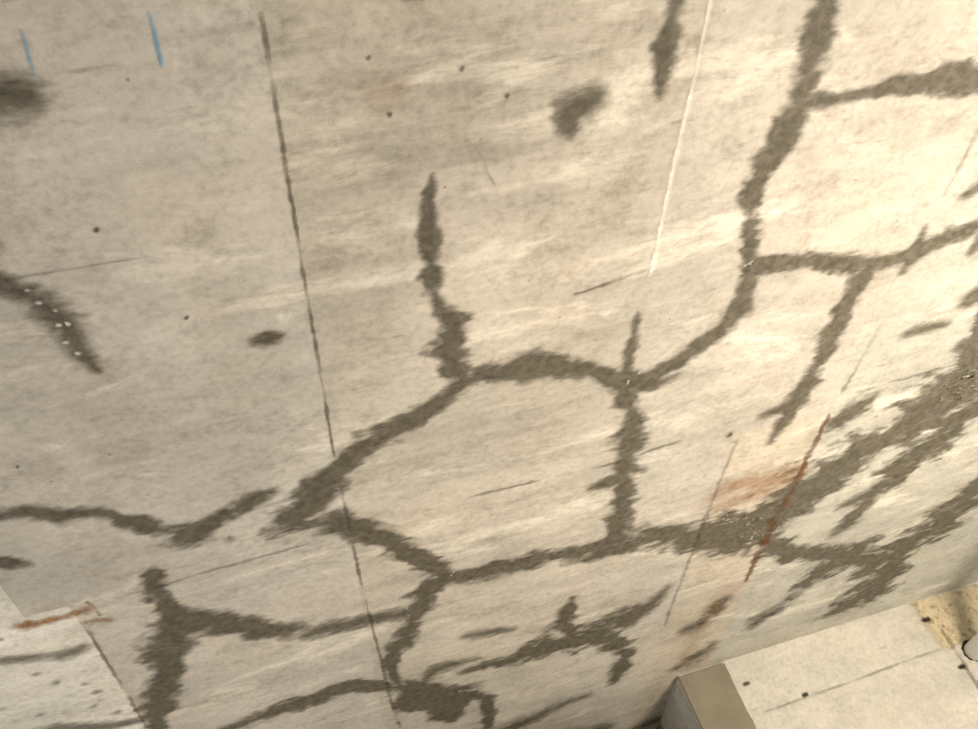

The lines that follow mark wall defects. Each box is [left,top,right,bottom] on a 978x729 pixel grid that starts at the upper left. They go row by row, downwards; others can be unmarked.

rust [16,602,111,628]
leakage [222,0,978,729]